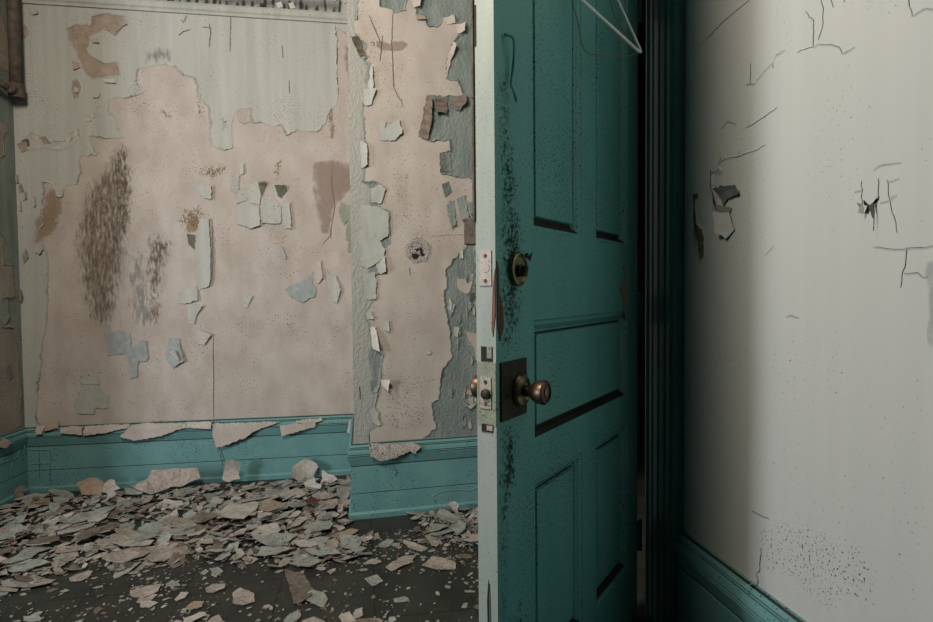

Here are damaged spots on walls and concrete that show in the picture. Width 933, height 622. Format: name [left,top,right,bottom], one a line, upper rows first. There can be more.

crack [745,0,855,86]
crack [907,0,933,17]
water stain [85,150,132,320]
water stain [136,242,167,292]
peeling [0,0,477,461]
crack [854,162,933,287]